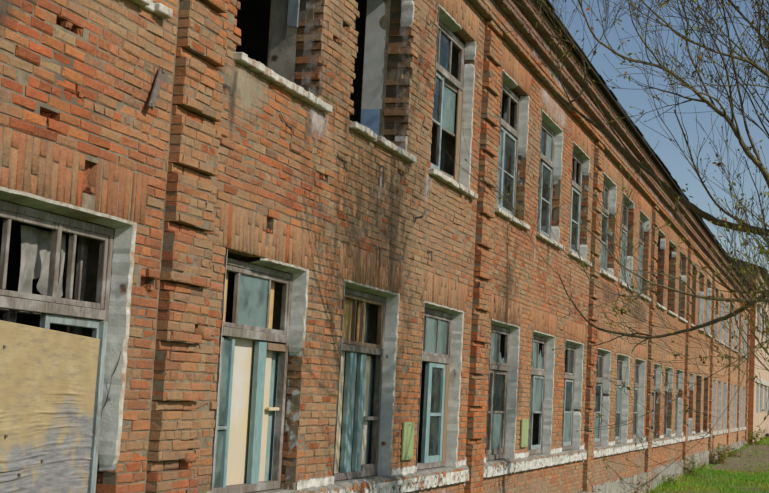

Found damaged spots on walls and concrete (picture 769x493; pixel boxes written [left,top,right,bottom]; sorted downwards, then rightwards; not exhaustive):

crack [101,352,121,417]
peeling [297,459,469,493]
peeling [483,429,710,478]